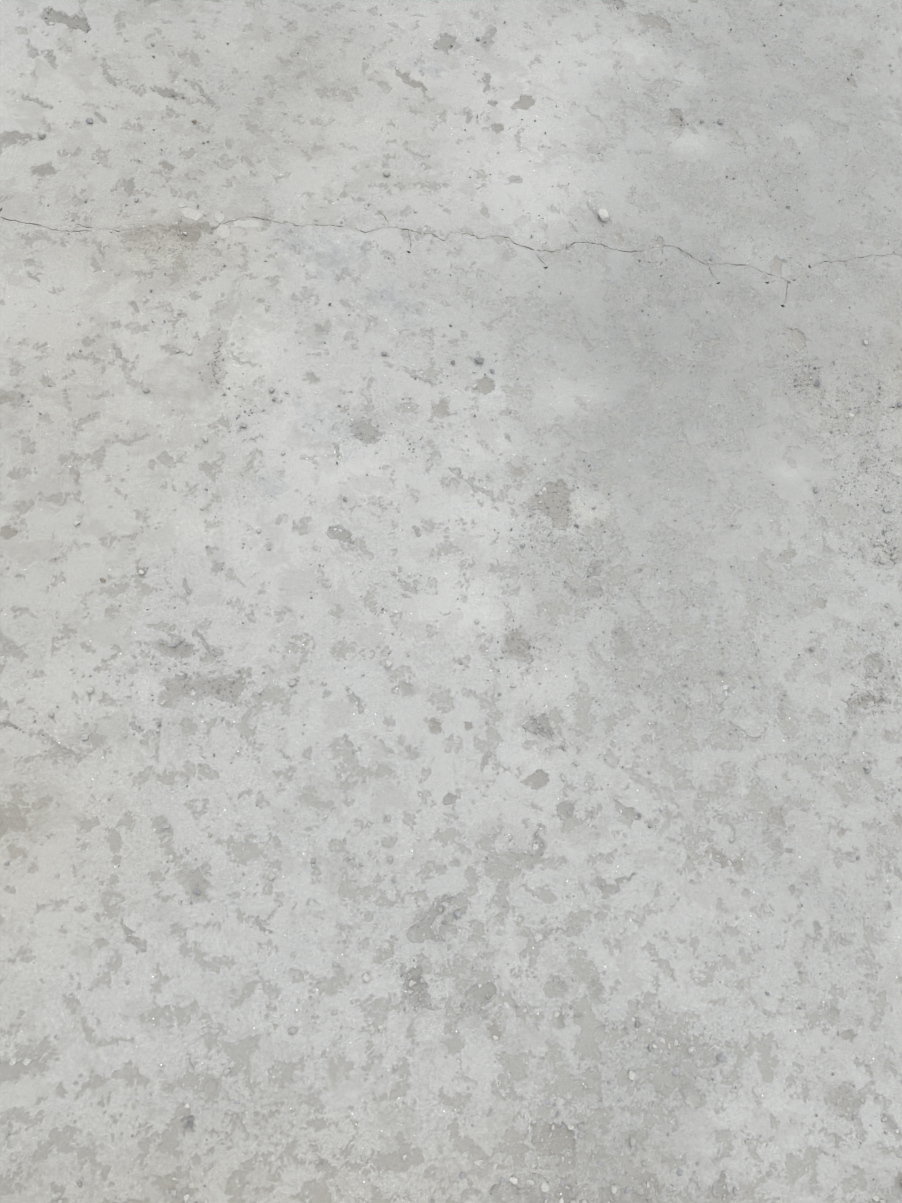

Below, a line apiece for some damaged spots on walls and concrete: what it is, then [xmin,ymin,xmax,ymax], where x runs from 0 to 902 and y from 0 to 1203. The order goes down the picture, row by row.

crack [0,202,902,306]